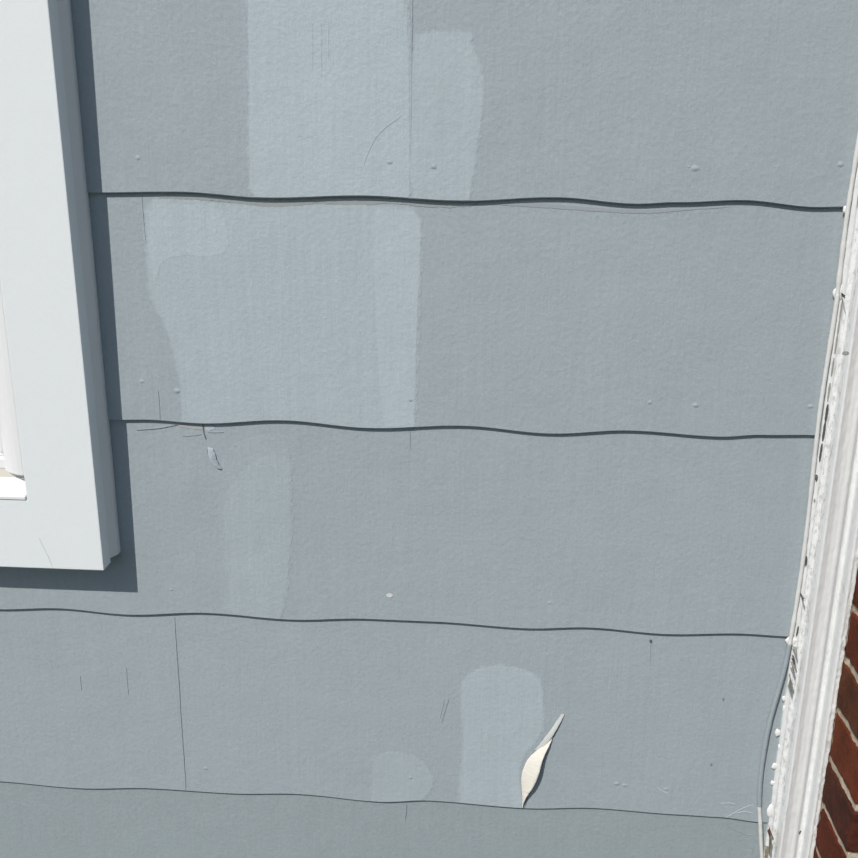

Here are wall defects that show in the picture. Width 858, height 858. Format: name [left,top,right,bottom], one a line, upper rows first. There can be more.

peeling [521,737,553,808]